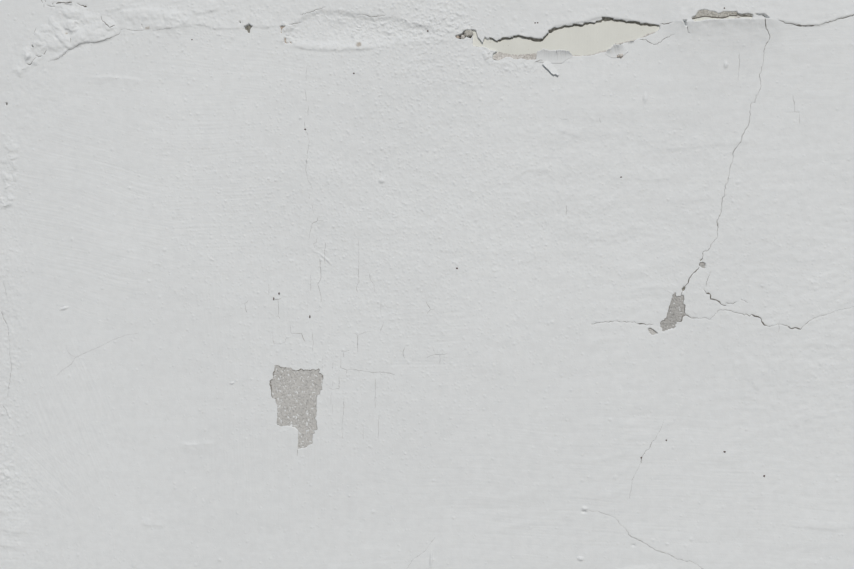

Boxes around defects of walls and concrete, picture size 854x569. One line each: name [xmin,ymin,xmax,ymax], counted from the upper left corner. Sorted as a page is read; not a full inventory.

spalling [490,17,660,42]
crack [681,15,854,329]
peeling [648,287,686,335]
peeling [269,365,323,449]